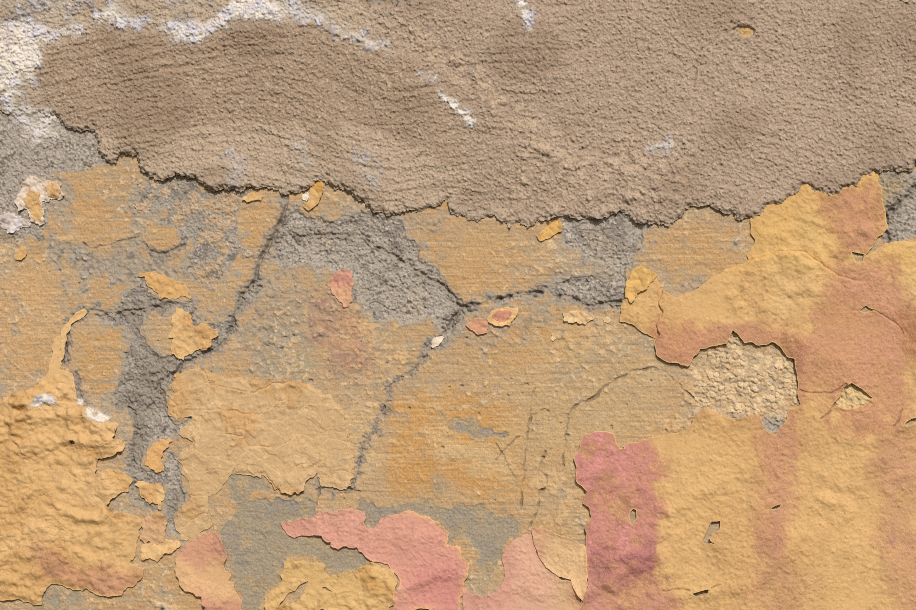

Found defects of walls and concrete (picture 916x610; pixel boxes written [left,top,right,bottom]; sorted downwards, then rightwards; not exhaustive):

efflorescence [0,0,389,147]
efflorescence [511,0,536,31]
peeling [0,110,110,260]
crack [82,236,187,256]
crack [62,303,173,404]
crack [128,196,622,513]
peeling [0,170,916,610]
crack [495,366,695,532]